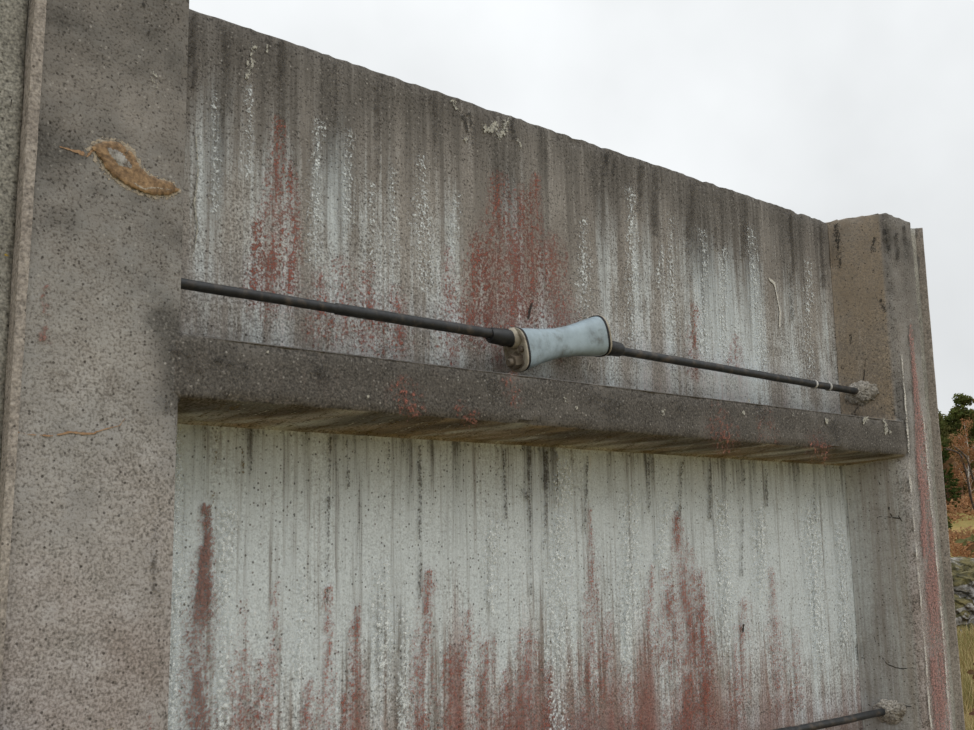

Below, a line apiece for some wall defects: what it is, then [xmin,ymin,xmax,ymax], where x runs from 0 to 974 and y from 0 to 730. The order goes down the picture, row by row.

spalling [59,137,181,199]
water stain [245,42,406,357]
water stain [414,156,433,290]
water stain [444,173,593,329]
water stain [623,165,660,338]
water stain [787,214,842,318]
water stain [293,430,775,730]